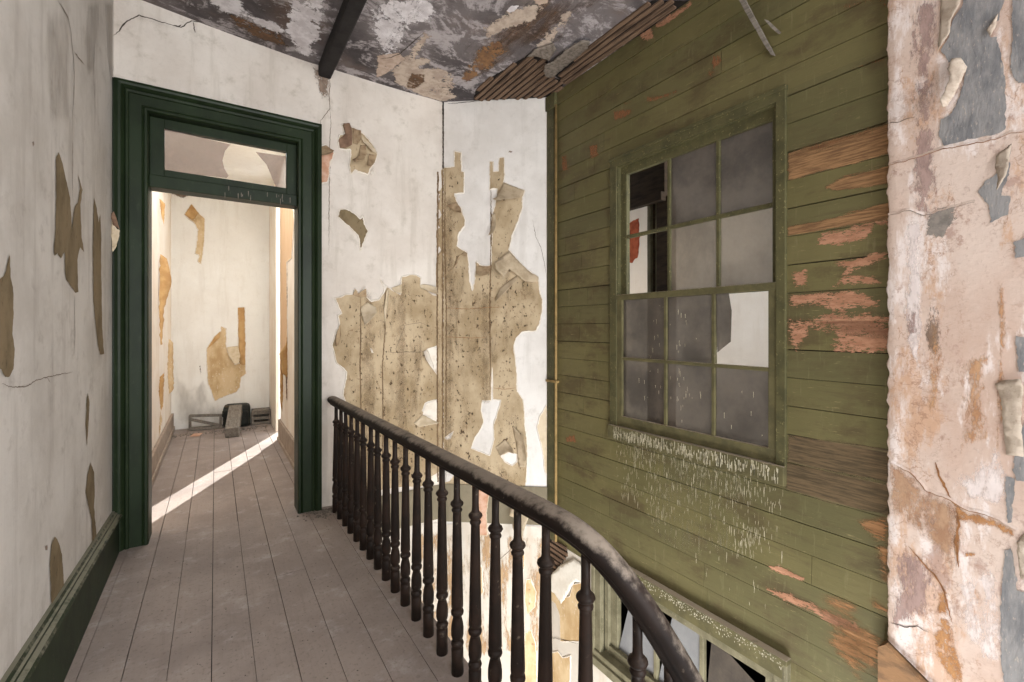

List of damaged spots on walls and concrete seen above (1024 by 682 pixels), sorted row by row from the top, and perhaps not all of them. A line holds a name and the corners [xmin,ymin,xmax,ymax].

peeling [210,0,325,58]
peeling [368,0,457,101]
flaking render [937,0,1024,145]
flaking render [322,123,377,184]
crack [888,129,1024,165]
flaking render [0,256,15,377]
flaking render [54,152,120,355]
peeling [200,307,246,401]
flaking render [331,151,543,491]
peeling [788,252,889,353]
damp [614,426,778,562]
crack [890,460,1019,622]